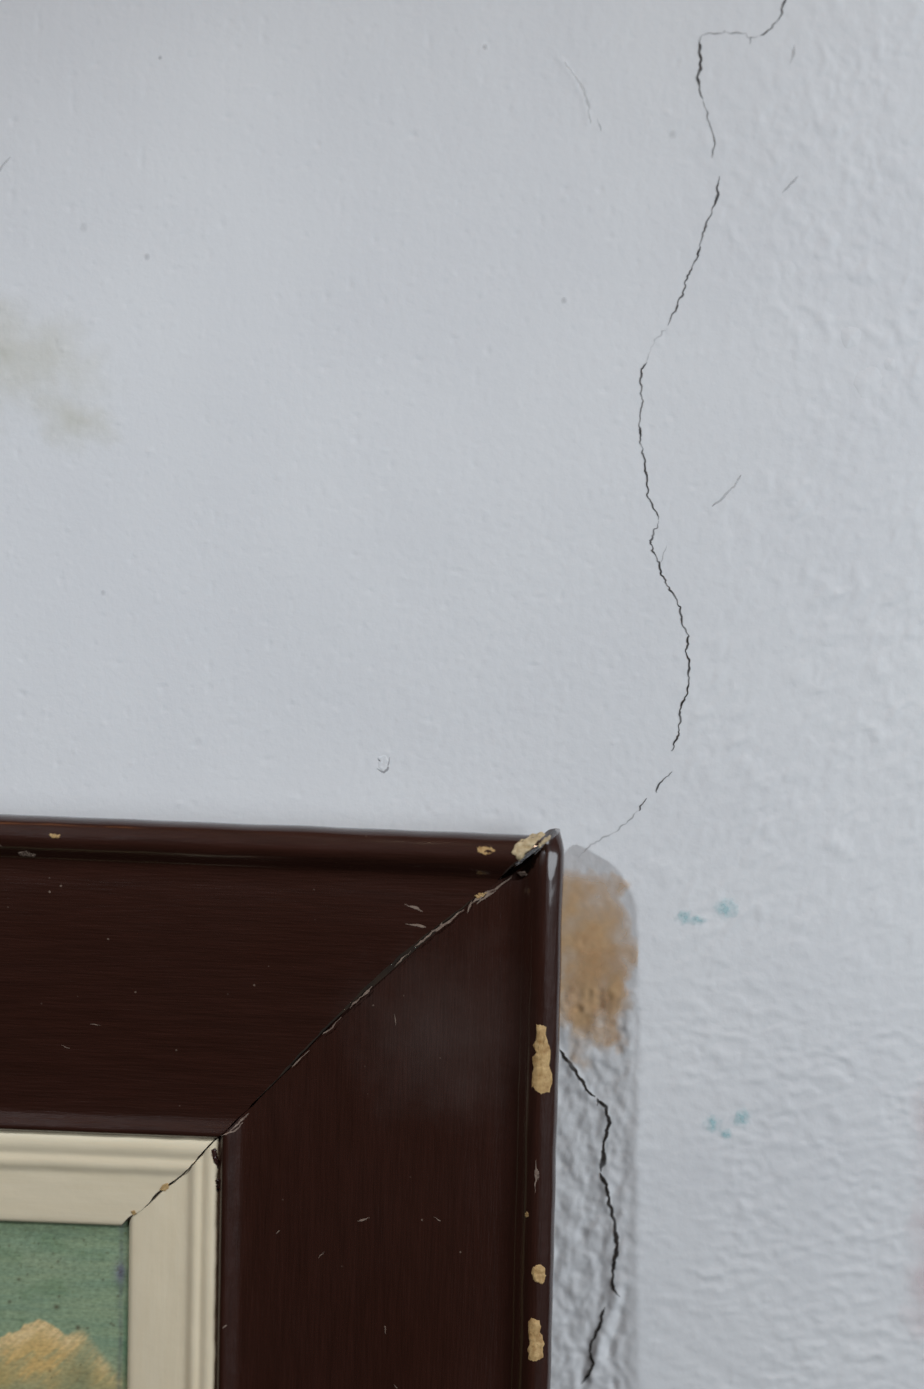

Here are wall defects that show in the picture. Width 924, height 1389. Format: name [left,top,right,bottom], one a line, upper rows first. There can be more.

crack [668,31,725,325]
crack [761,0,786,36]
crack [639,363,690,811]
crack [559,1049,620,1384]